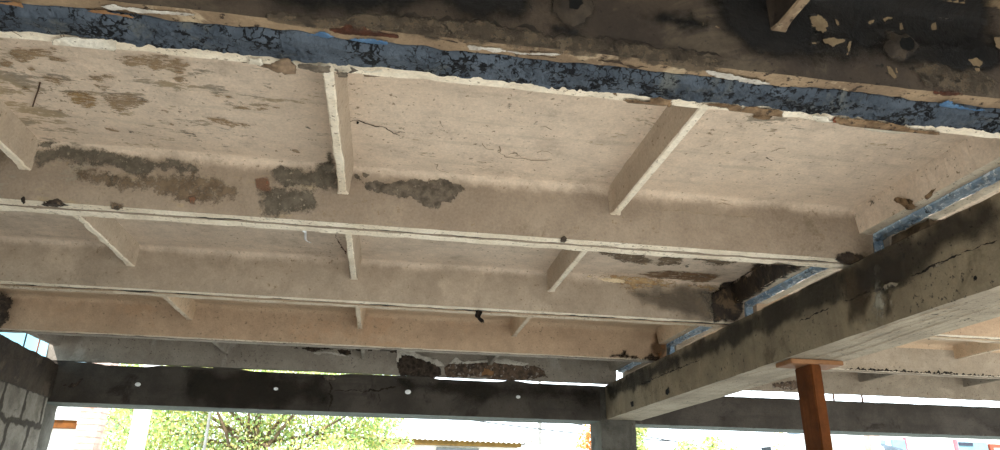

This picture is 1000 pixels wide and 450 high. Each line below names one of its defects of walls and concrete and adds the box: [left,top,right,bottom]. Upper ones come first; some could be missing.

flaking render [267,12,770,85]
peeling [810,14,852,55]
flaking render [914,58,998,95]
water stain [34,142,237,204]
water stain [255,153,338,218]
crack [912,240,997,276]
water stain [600,204,996,399]
flaking render [296,347,548,381]